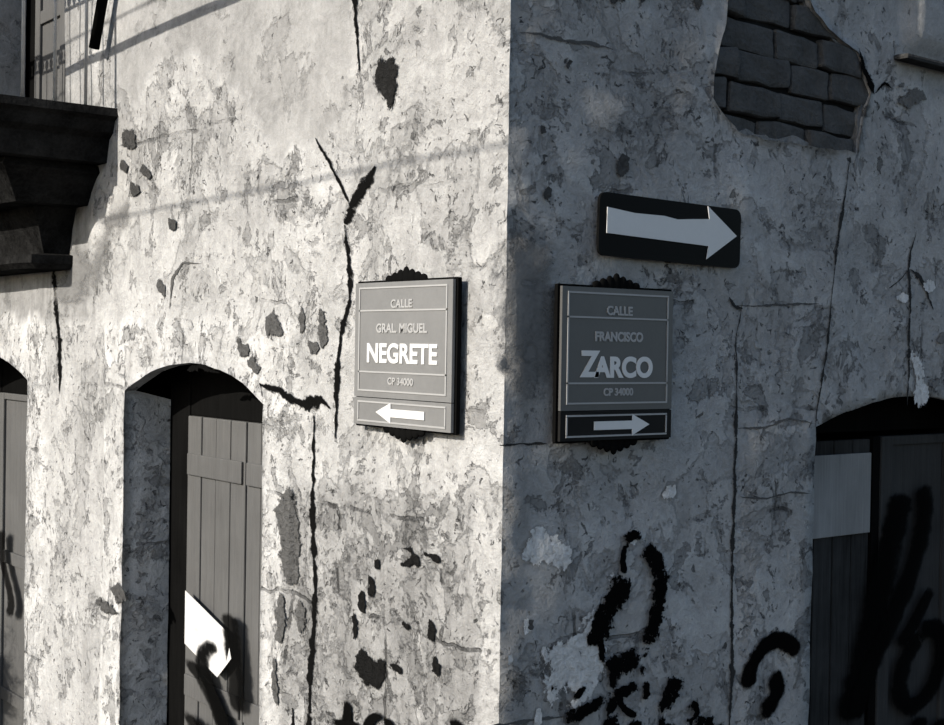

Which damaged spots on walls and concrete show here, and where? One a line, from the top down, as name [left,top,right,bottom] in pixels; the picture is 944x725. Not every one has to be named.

crack [352,0,360,70]
flaking render [714,0,869,163]
crack [889,231,933,405]
crack [729,158,850,725]
spalling [523,618,534,635]
spalling [522,525,573,572]